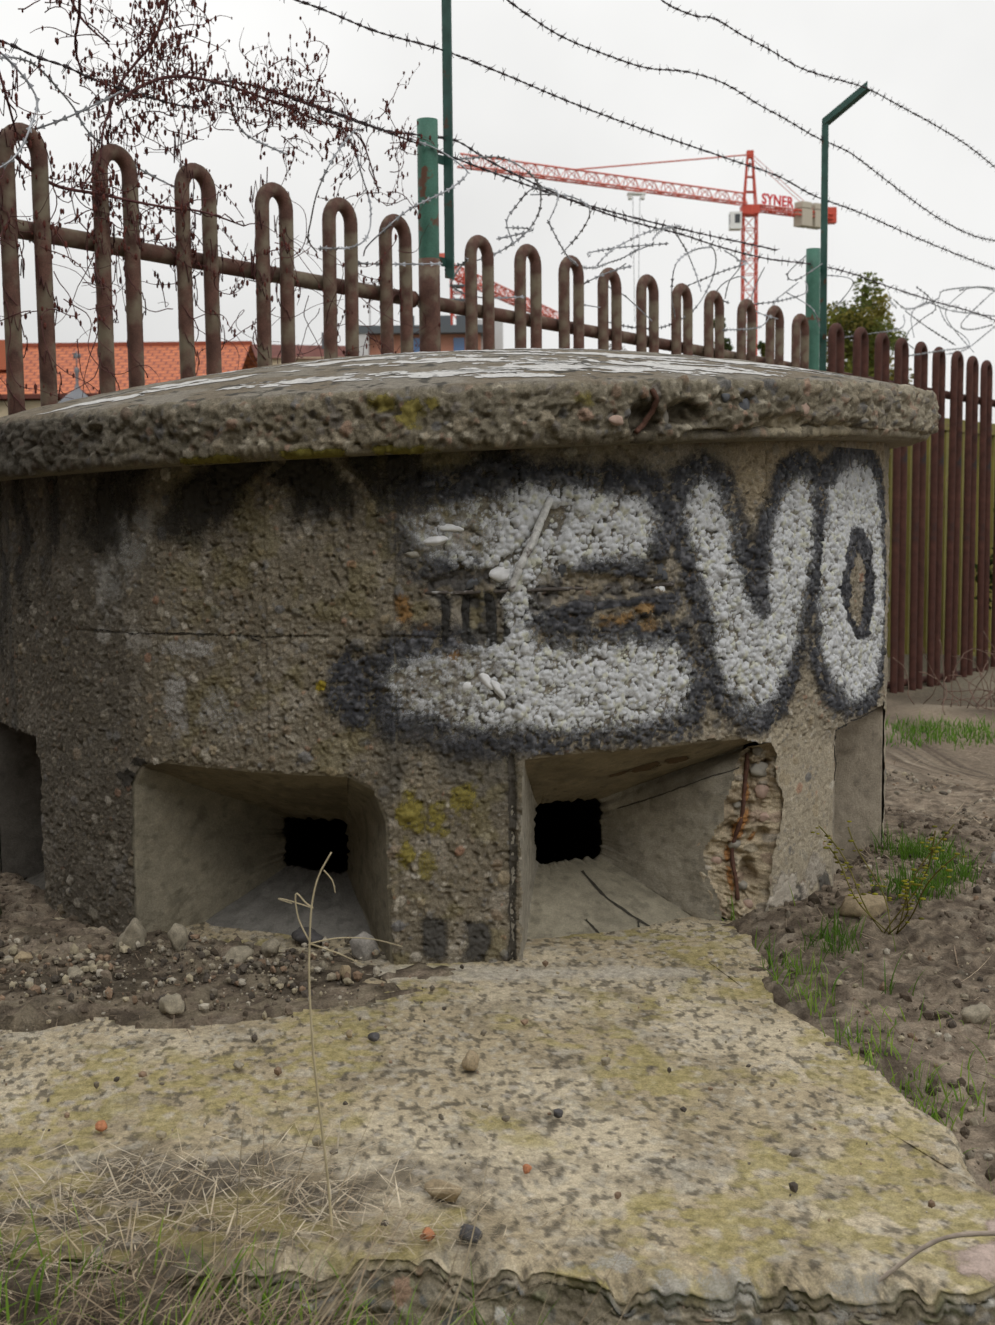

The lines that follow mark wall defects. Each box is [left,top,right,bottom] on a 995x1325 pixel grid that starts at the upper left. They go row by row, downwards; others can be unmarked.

spalling [696,742,784,921]
corrosion [724,782,756,891]